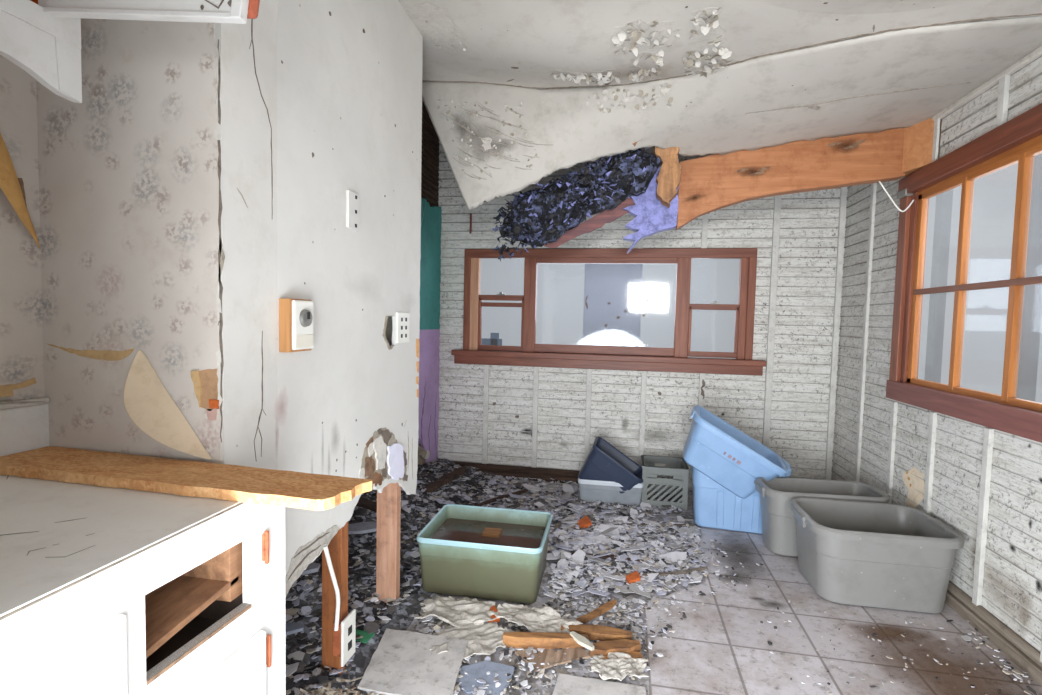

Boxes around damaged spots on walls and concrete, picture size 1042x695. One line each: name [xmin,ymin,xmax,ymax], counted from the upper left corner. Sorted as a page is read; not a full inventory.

peeling [549,6,736,113]
peeling [216,239,225,313]
peeling [190,370,223,421]
flaking render [336,339,437,487]